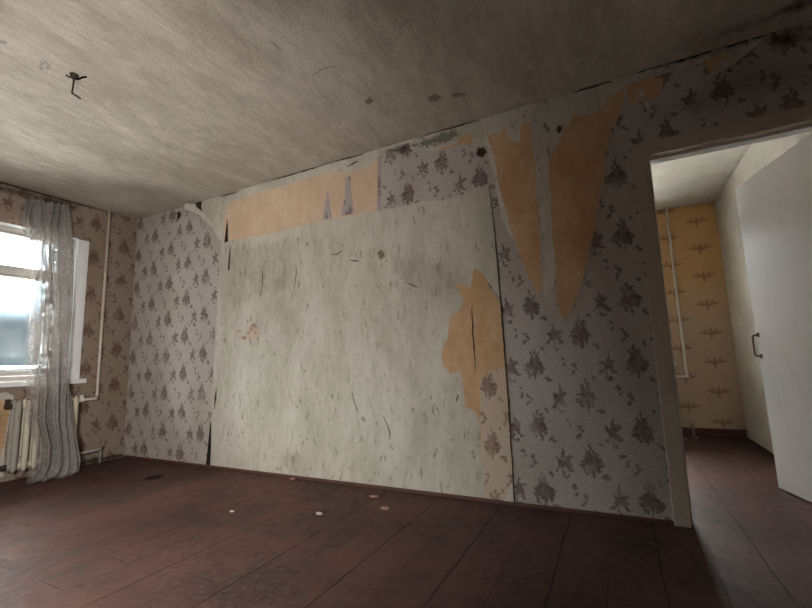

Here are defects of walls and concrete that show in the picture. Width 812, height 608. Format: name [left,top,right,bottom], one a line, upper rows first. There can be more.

peeling [0,392,14,477]